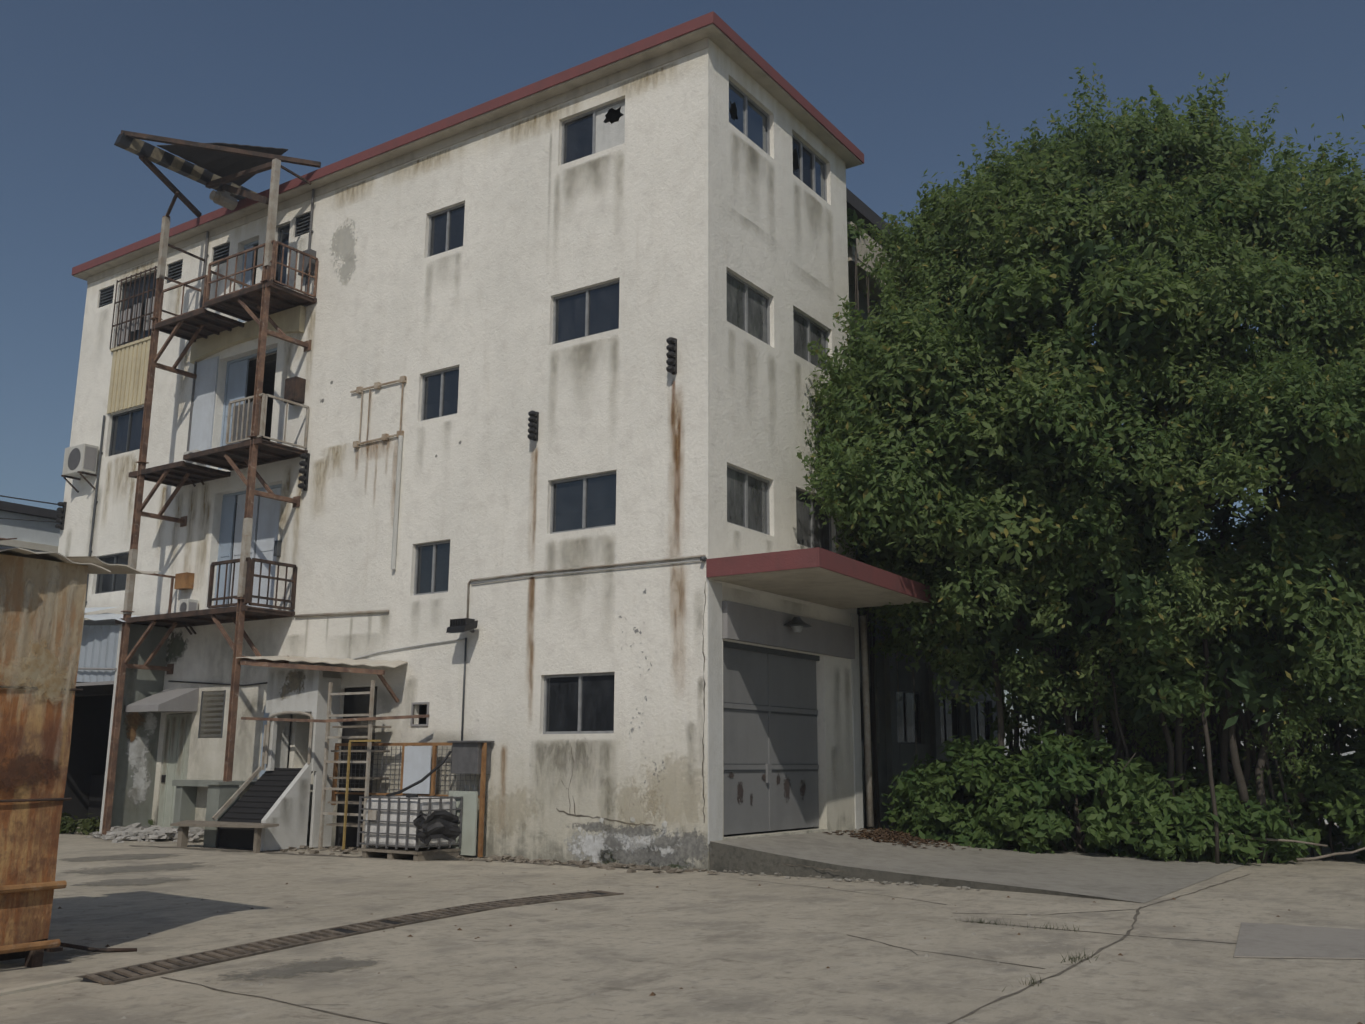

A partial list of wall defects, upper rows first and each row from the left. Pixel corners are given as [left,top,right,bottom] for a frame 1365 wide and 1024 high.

corrosion [671,383,680,471]
corrosion [0,752,59,793]
corrosion [729,772,753,806]